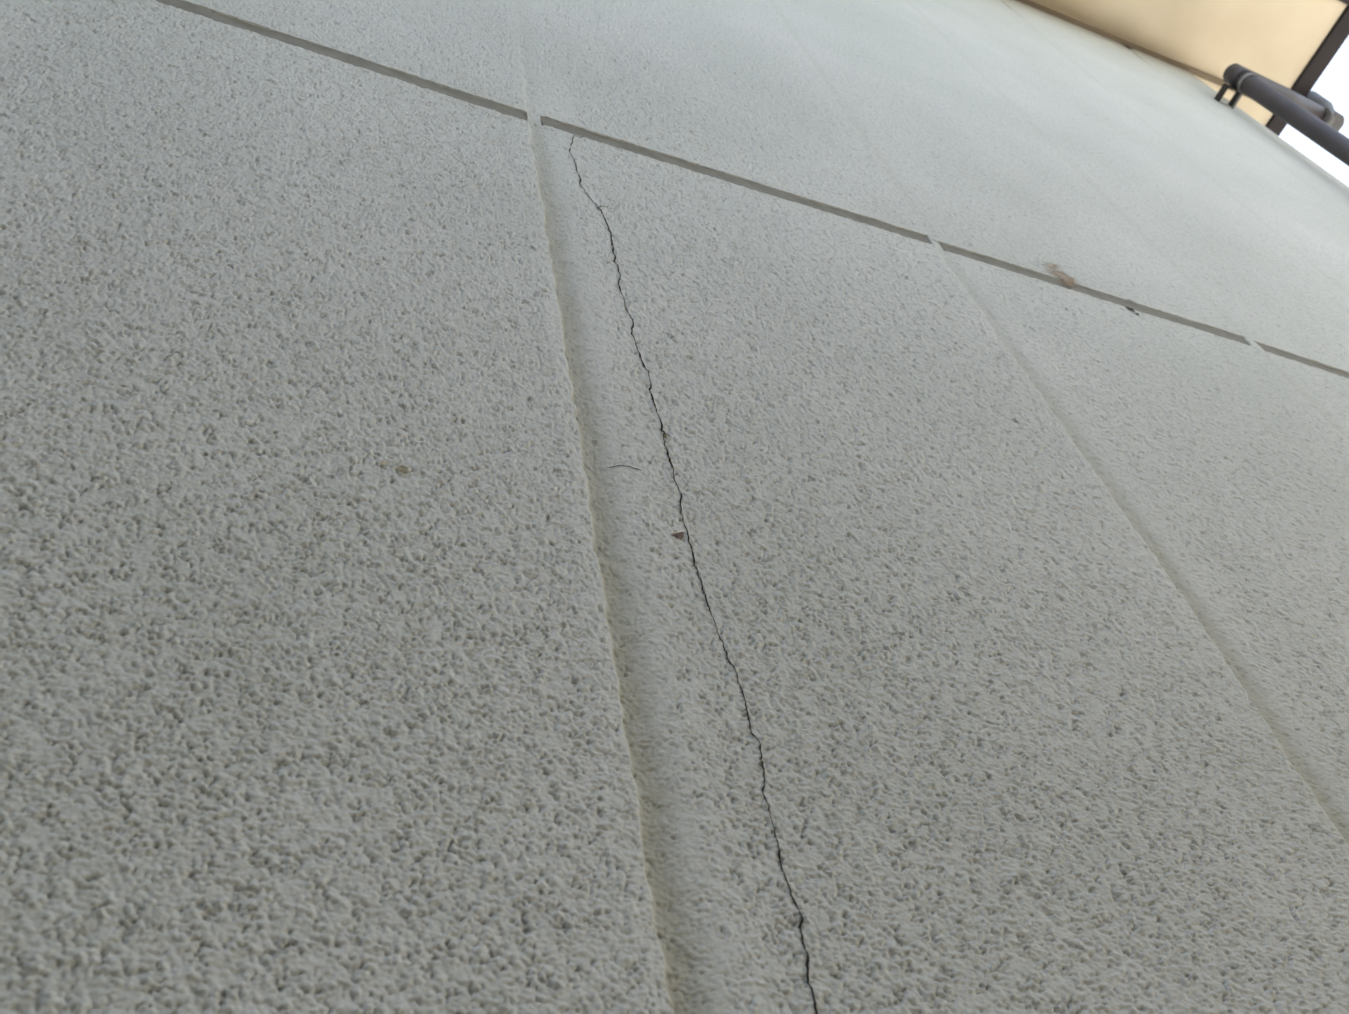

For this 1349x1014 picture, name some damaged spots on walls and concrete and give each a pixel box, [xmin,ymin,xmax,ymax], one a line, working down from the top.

crack [569,135,818,1014]